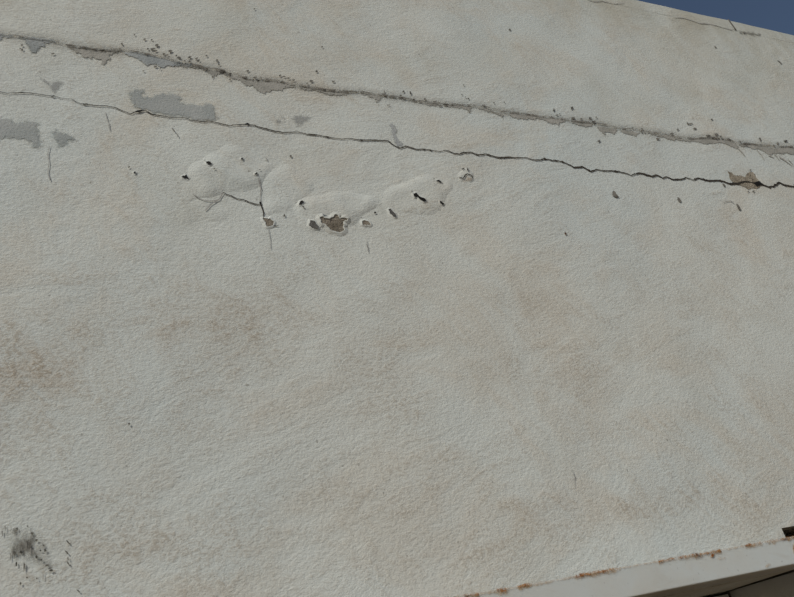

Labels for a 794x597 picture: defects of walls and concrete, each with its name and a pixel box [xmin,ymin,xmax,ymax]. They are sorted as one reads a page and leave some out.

peeling [0,34,794,155]
crack [0,91,794,188]
crack [195,180,279,249]
flaking render [722,169,759,192]
leakage [2,525,53,585]